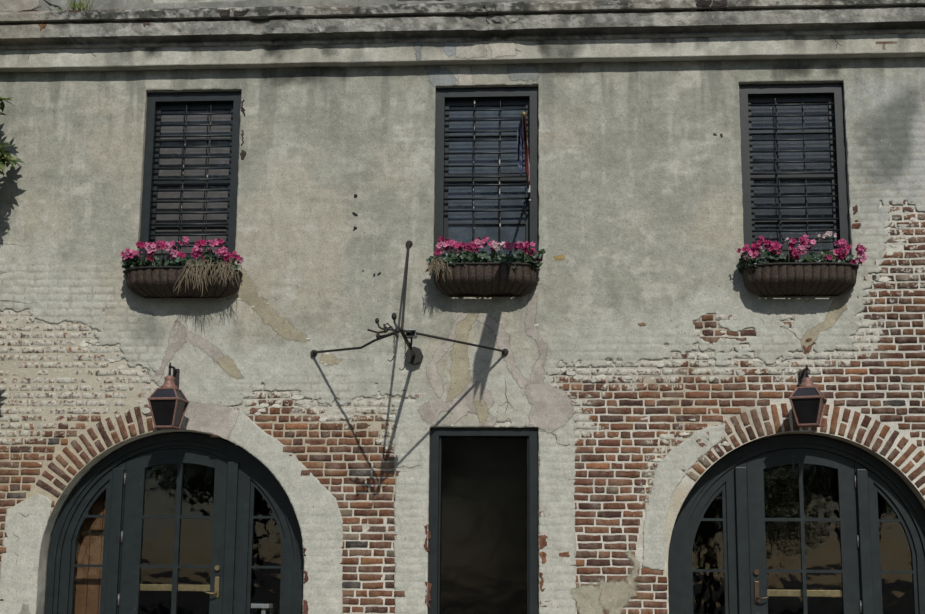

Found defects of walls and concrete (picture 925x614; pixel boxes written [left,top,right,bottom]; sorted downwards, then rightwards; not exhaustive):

water stain [868,92,916,178]
spalling [861,200,925,324]
spalling [693,315,756,344]
spalling [0,310,161,430]
flaking render [566,363,612,383]
flaking render [237,394,281,416]
flaking render [290,391,311,410]
flaking render [660,432,690,441]
spalling [538,534,548,592]